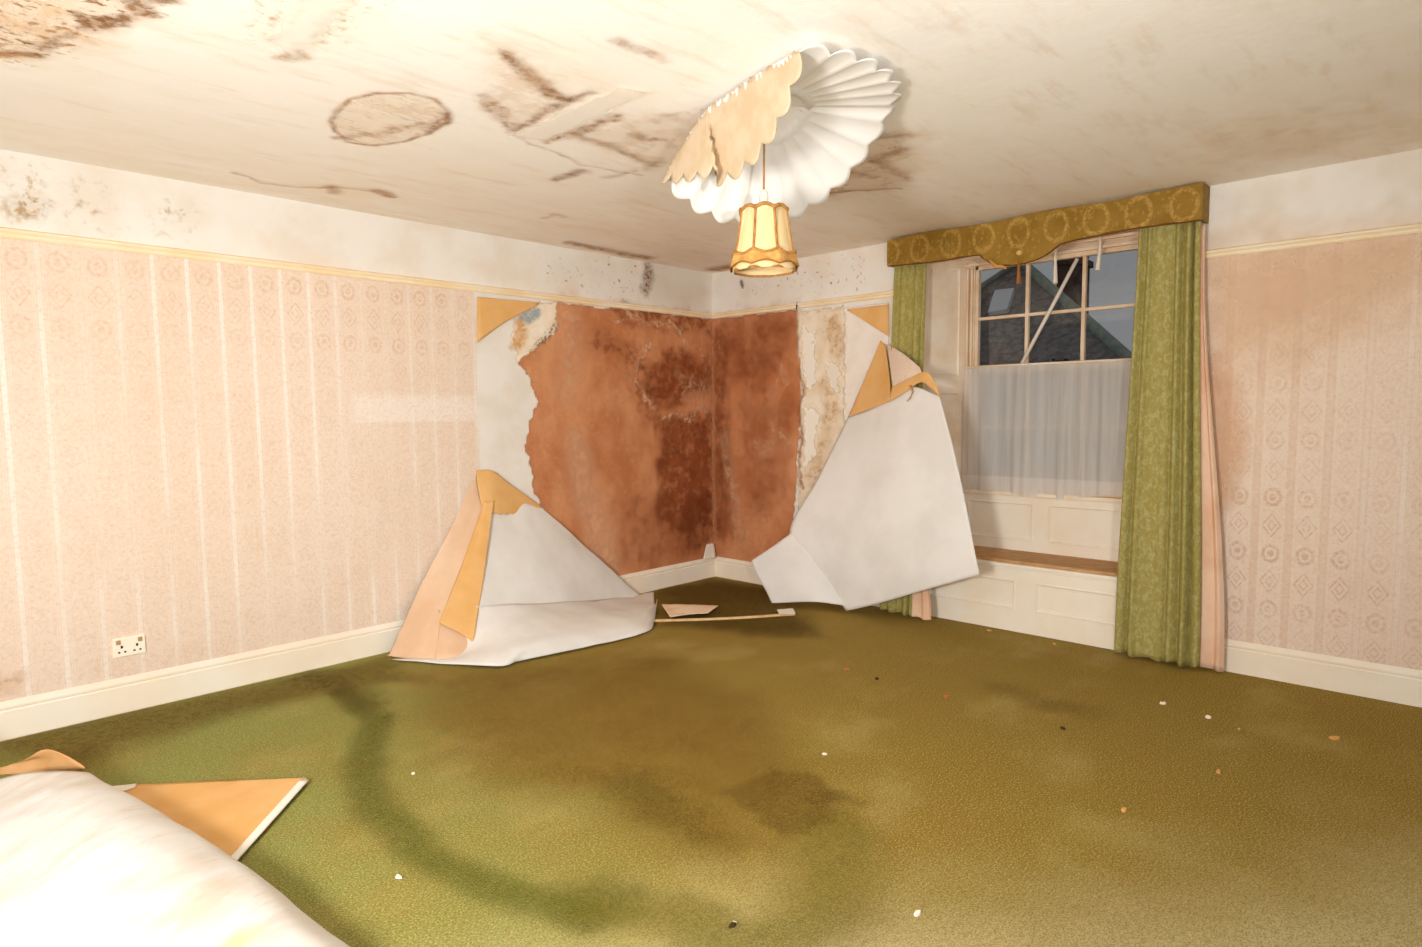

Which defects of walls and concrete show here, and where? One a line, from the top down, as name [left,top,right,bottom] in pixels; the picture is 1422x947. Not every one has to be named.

water stain [0,0,175,62]
water stain [503,53,582,129]
water stain [573,243,652,294]
water stain [615,310,743,545]
flaking render [511,301,889,576]